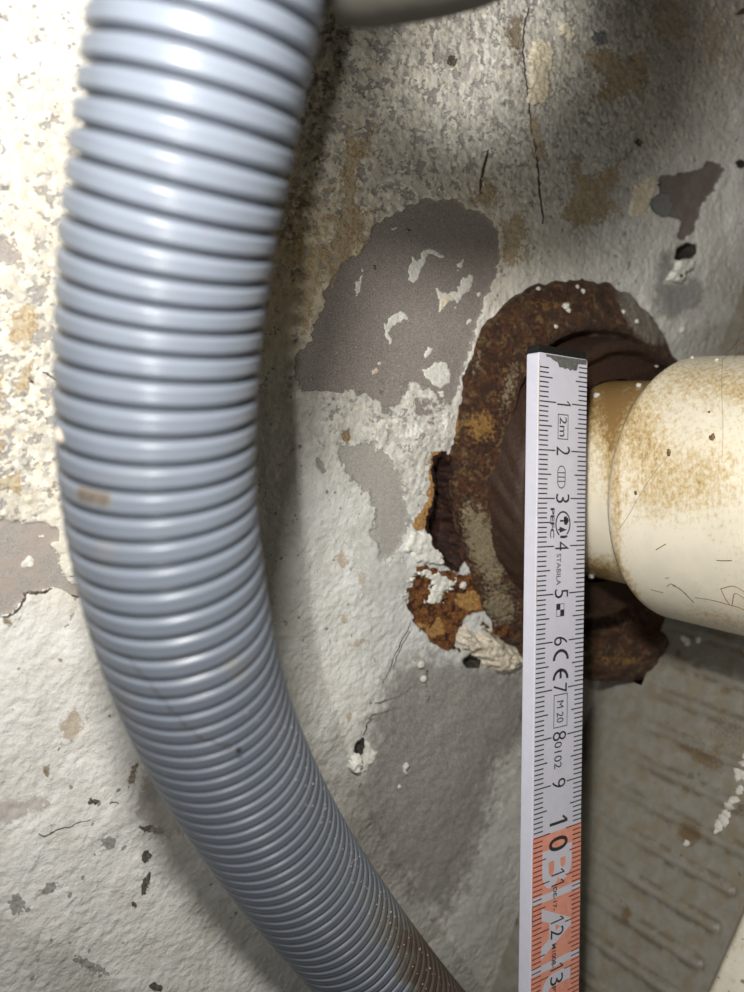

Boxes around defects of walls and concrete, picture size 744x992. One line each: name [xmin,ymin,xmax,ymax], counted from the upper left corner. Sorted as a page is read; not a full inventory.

crack [522,7,544,224]
peeling [628,161,724,284]
peeling [294,198,500,440]
peeling [0,517,79,626]
peeling [337,432,466,572]
rust [405,565,514,652]